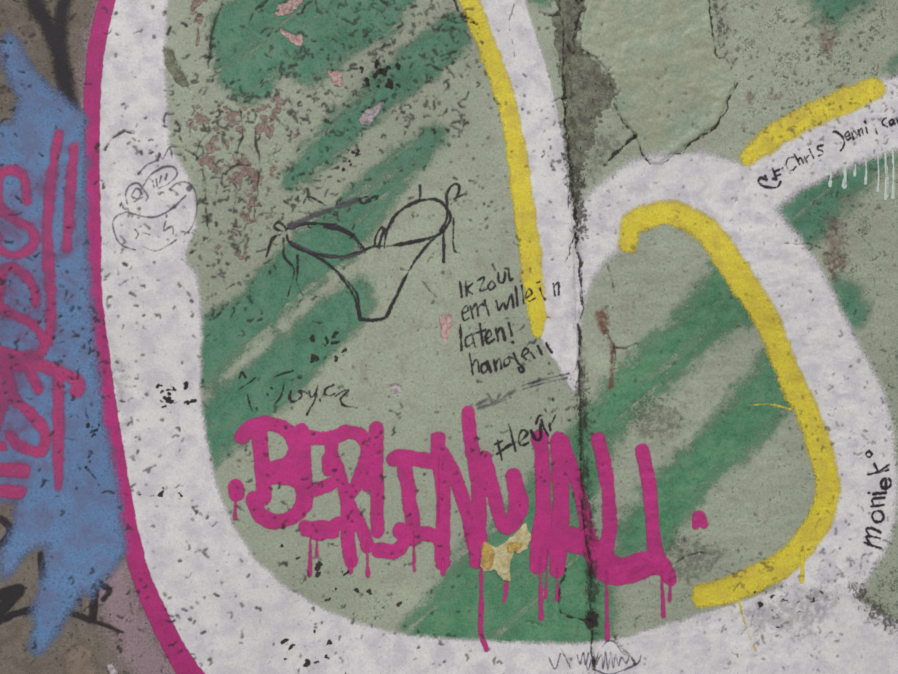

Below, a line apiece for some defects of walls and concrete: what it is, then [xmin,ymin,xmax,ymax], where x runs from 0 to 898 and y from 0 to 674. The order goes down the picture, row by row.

peeling [189,0,207,46]
peeling [275,0,303,16]
peeling [280,29,303,46]
peeling [164,47,189,87]
crack [604,0,738,166]
peeling [184,95,286,224]
crack [544,0,636,670]